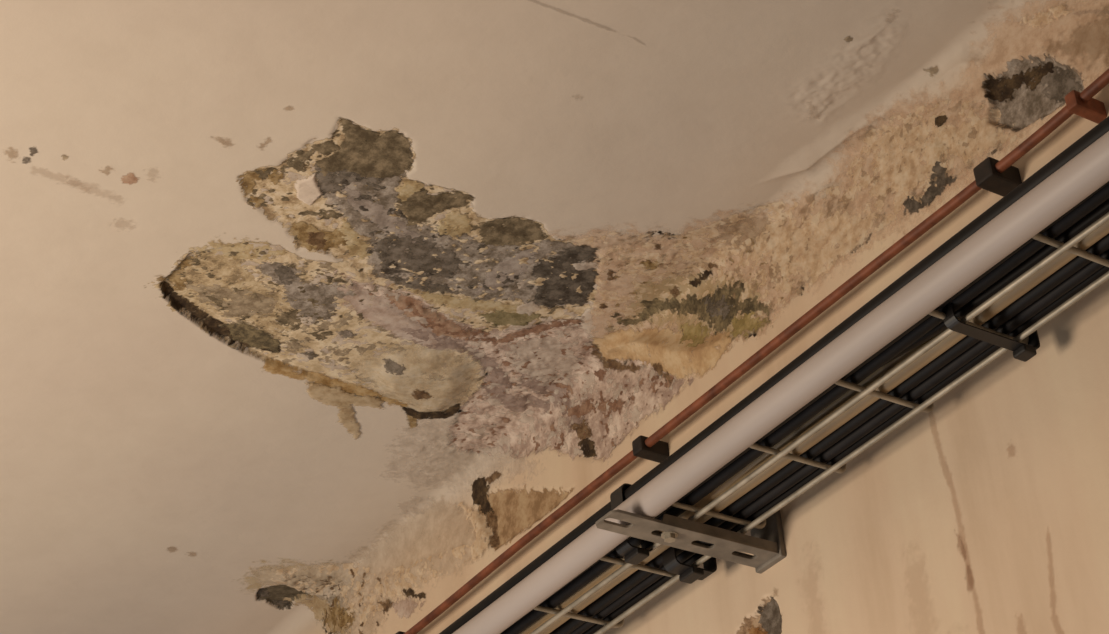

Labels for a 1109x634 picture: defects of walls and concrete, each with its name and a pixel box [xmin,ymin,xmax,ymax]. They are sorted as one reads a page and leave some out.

leakage [838,0,1109,232]
spalling [982,54,1085,132]
spalling [148,118,693,462]
leakage [591,231,792,347]
flaking render [257,502,492,634]
spalling [737,597,782,634]